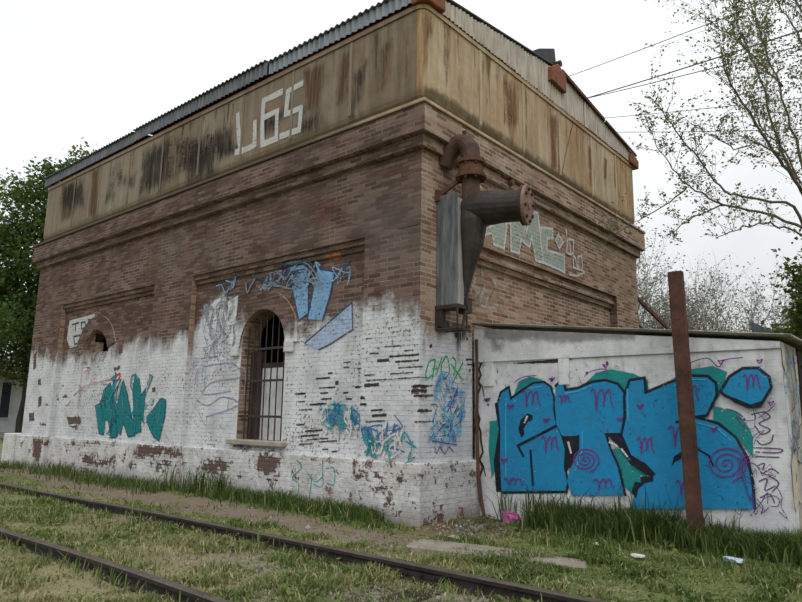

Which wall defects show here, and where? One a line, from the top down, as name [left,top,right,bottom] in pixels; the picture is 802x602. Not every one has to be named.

rust [504,76,516,128]
leakage [264,113,280,136]
rust [547,105,560,169]
leakage [107,126,237,199]
leakage [63,185,83,206]
peeling [32,436,41,462]
peeling [65,432,118,474]
peeling [129,441,181,472]
peeling [202,457,233,478]
peeling [233,445,282,485]